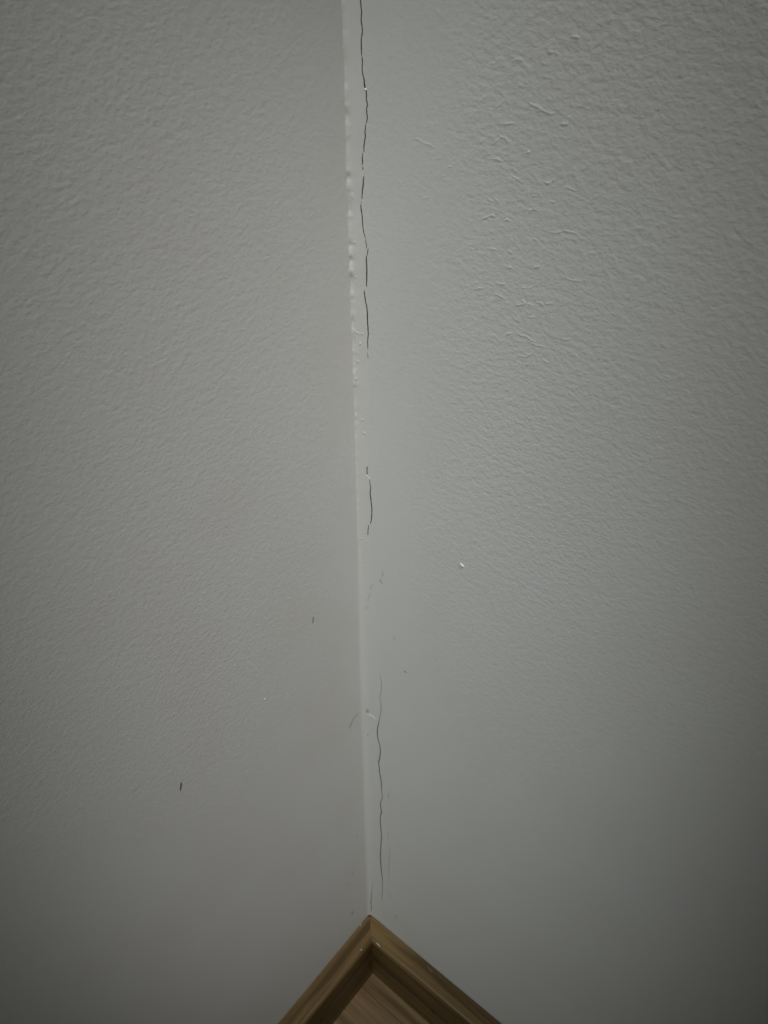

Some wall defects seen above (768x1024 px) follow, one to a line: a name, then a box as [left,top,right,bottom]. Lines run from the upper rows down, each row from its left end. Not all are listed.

crack [360,0,369,356]
crack [365,466,373,535]
crack [371,677,383,909]